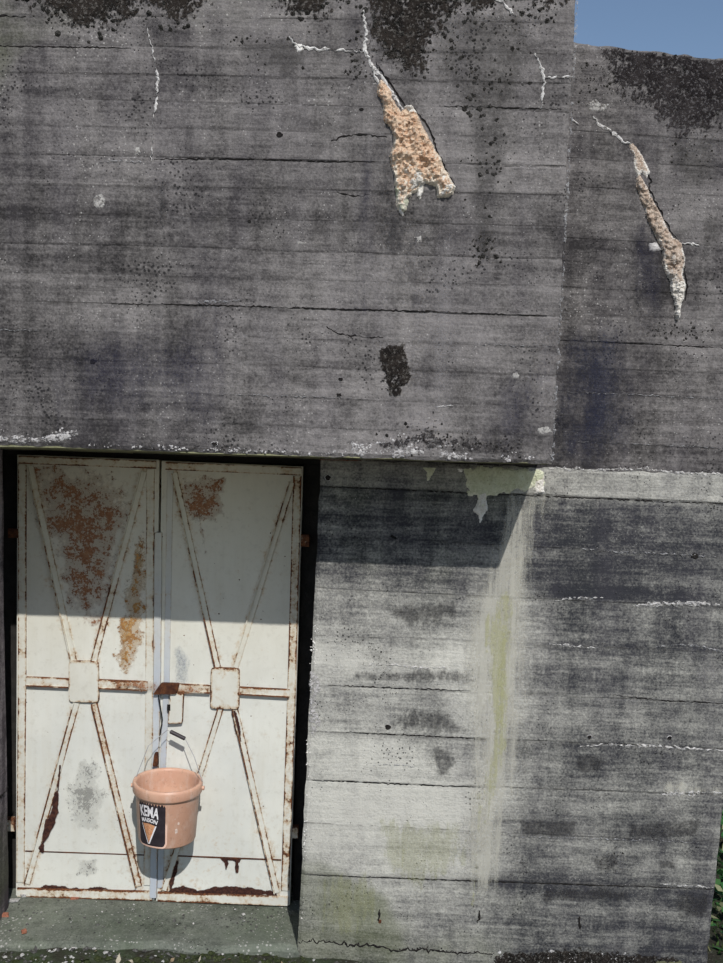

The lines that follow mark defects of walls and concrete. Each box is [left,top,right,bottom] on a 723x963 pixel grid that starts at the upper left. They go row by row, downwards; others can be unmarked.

crack [147,28,387,163]
crack [289,10,403,110]
spalling [376,62,457,216]
crack [445,53,632,144]
spalling [629,143,689,320]
rust [31,465,131,624]
rust [113,532,156,692]
leakage [458,466,545,888]
rust [38,765,61,853]
rust [168,861,277,896]
rust [220,858,241,873]
crack [299,938,493,955]